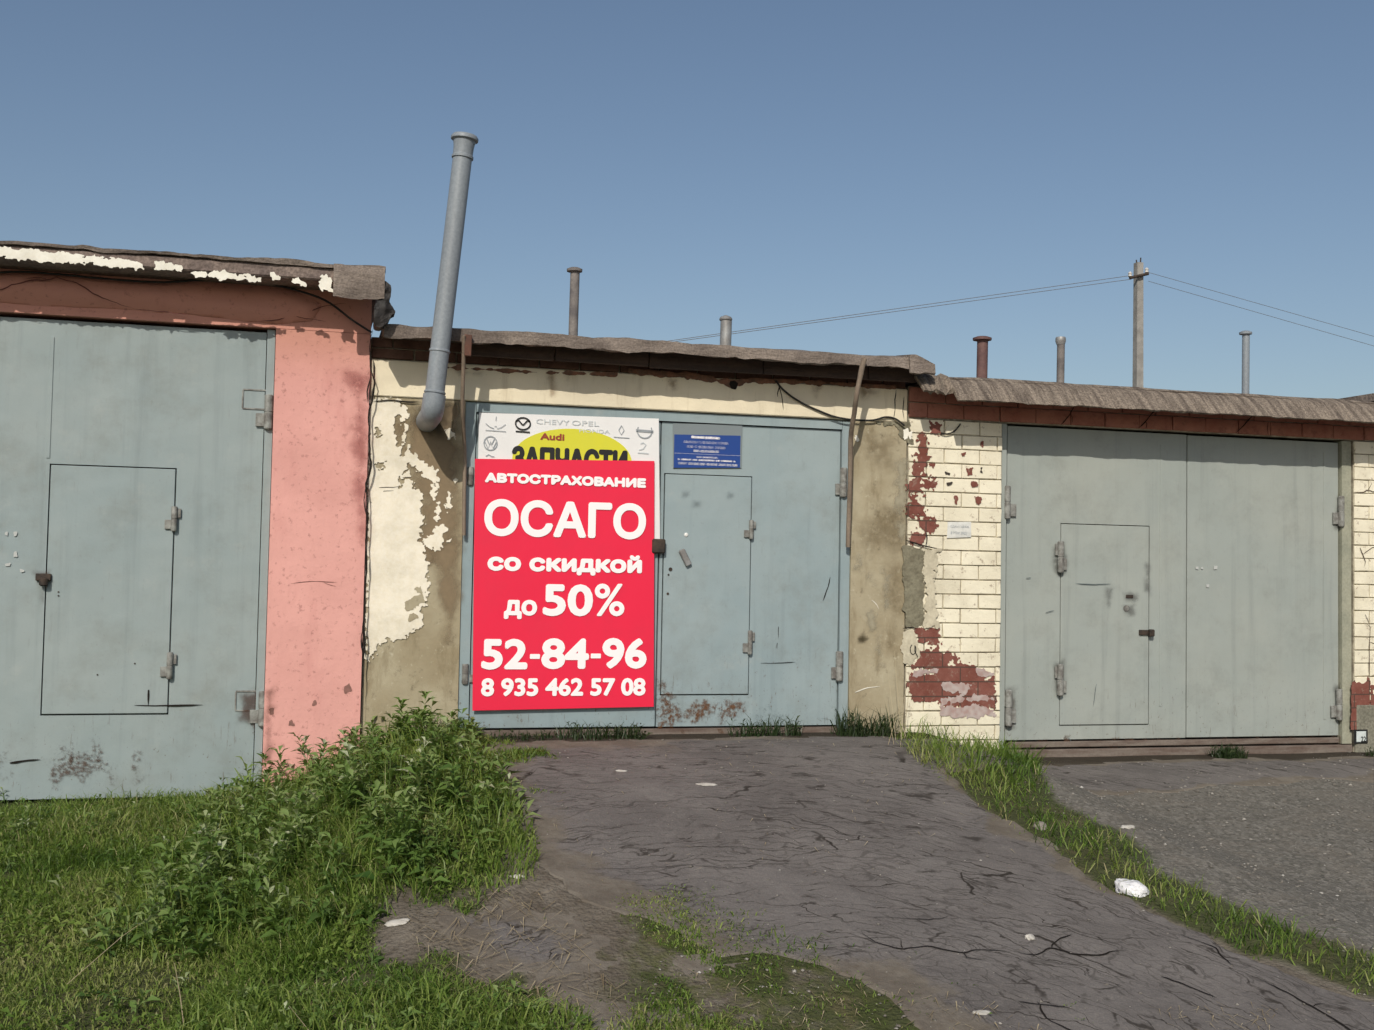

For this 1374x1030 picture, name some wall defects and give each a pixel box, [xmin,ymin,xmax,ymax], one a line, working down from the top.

peeling [0,246,333,292]
peeling [876,418,984,547]
peeling [363,397,458,662]
rust [658,683,744,730]
peeling [900,627,997,719]
peeling [1350,676,1374,730]